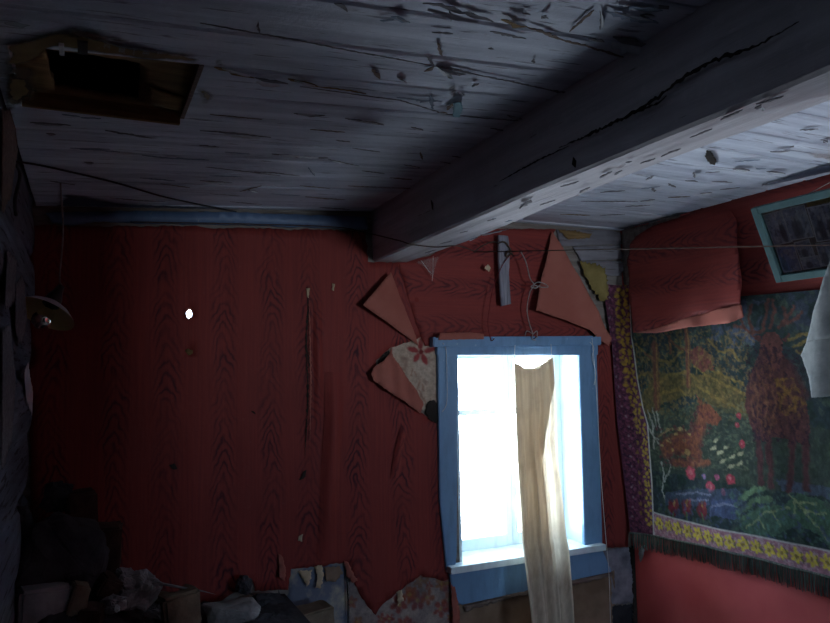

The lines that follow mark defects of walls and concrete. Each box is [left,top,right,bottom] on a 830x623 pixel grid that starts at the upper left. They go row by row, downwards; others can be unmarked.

crack [499,21,799,182]